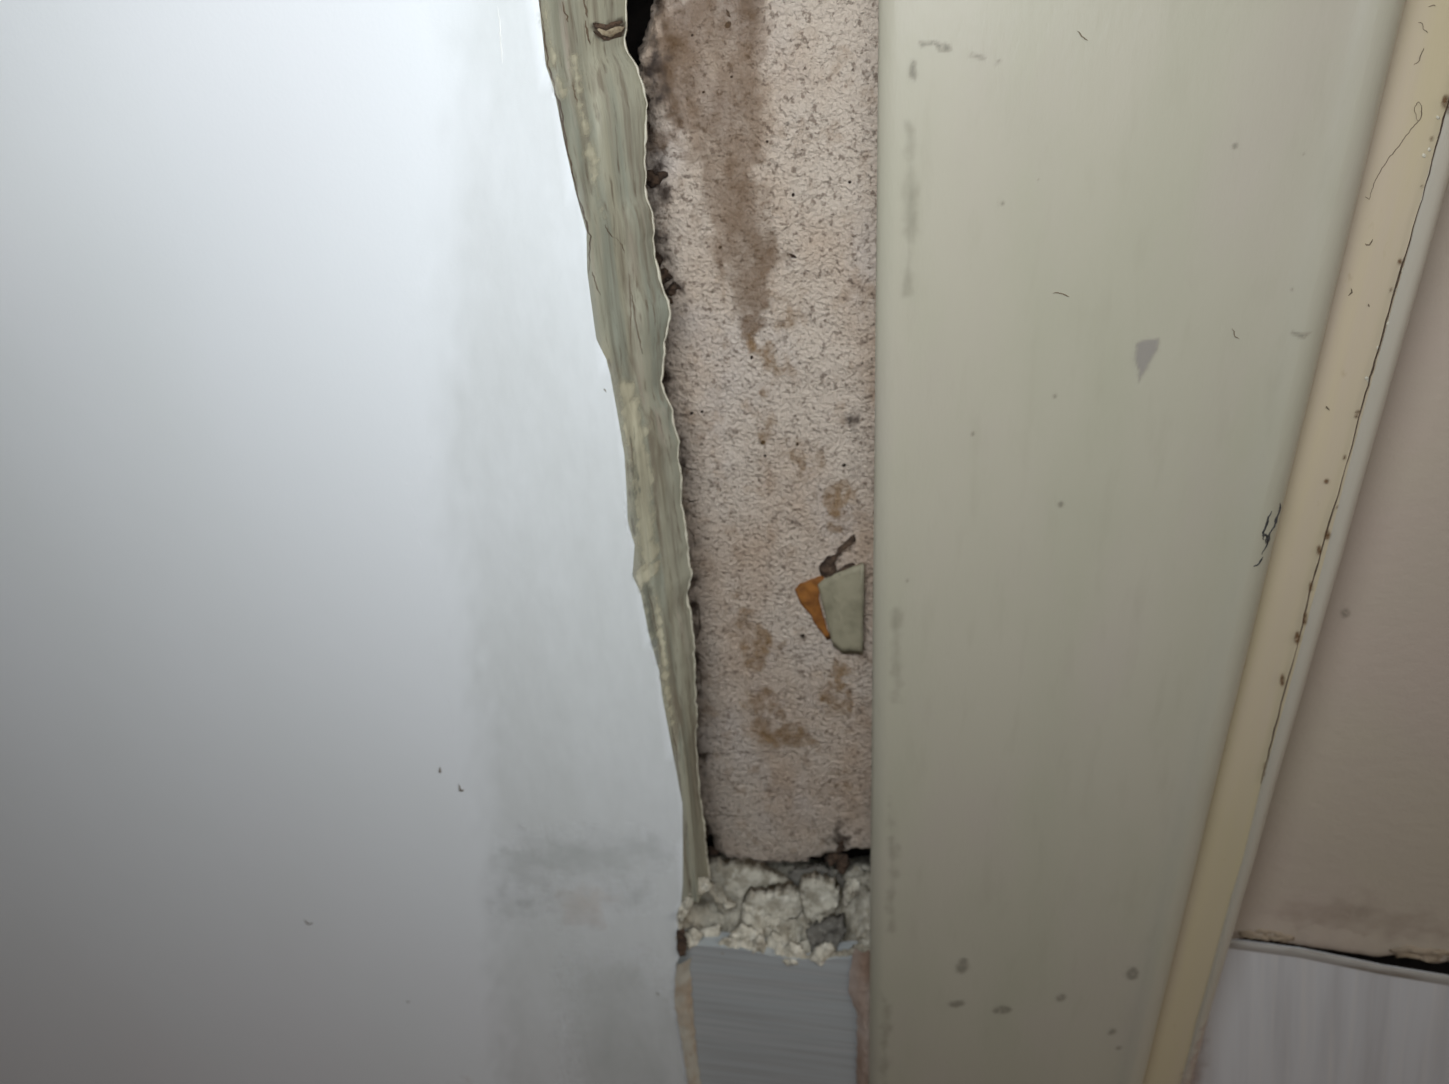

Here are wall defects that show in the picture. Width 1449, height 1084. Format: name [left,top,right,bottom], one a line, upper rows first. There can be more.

peeling [538,0,870,966]
spalling [1389,945,1449,963]